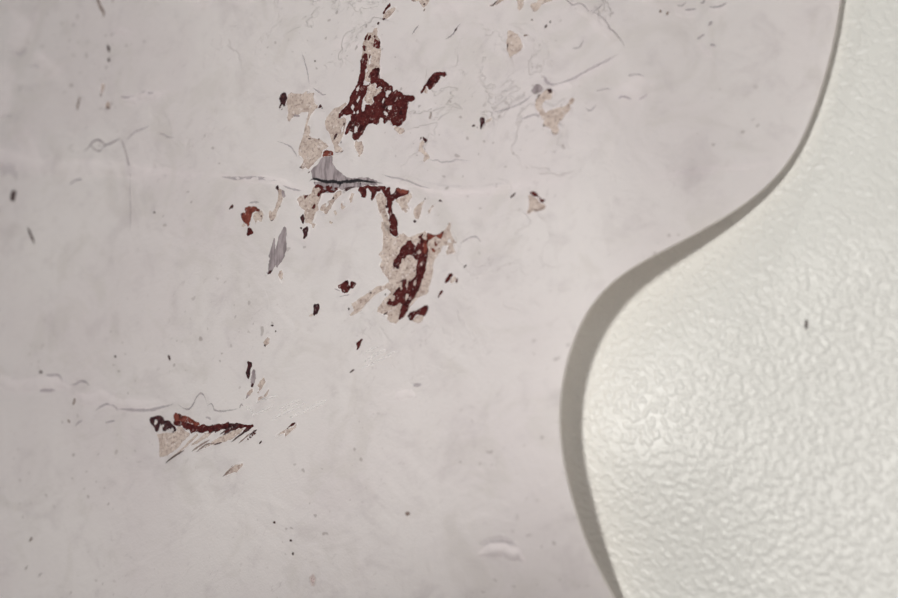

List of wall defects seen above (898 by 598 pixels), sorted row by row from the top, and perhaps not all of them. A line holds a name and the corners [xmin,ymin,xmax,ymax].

spalling [488,0,554,12]
spalling [279,3,447,171]
spalling [531,84,576,136]
crack [308,171,378,189]
spalling [229,184,467,325]
spalling [149,413,262,464]
peeling [273,422,297,438]